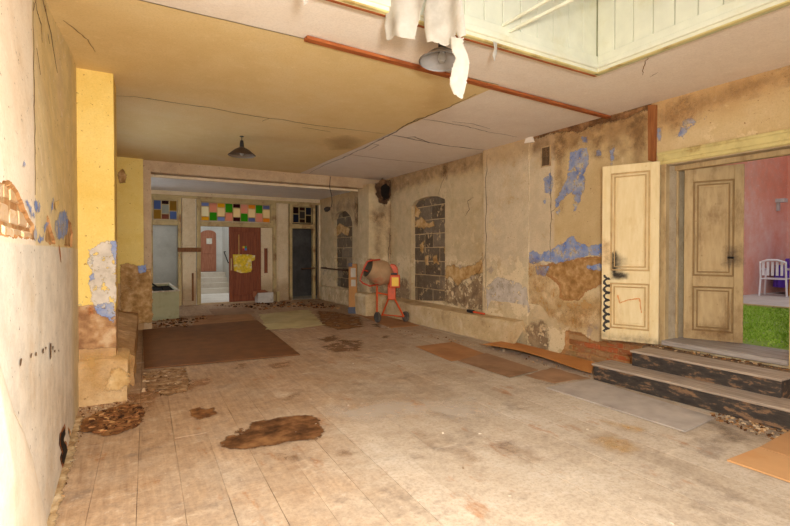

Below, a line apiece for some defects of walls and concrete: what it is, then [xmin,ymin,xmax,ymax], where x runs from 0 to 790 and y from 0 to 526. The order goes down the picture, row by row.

crack [33,1,95,130]
crack [115,96,514,167]
peeling [524,104,651,216]
flaking render [0,184,71,246]
spalling [78,240,153,349]
spalling [420,241,483,286]
spalling [529,236,602,300]